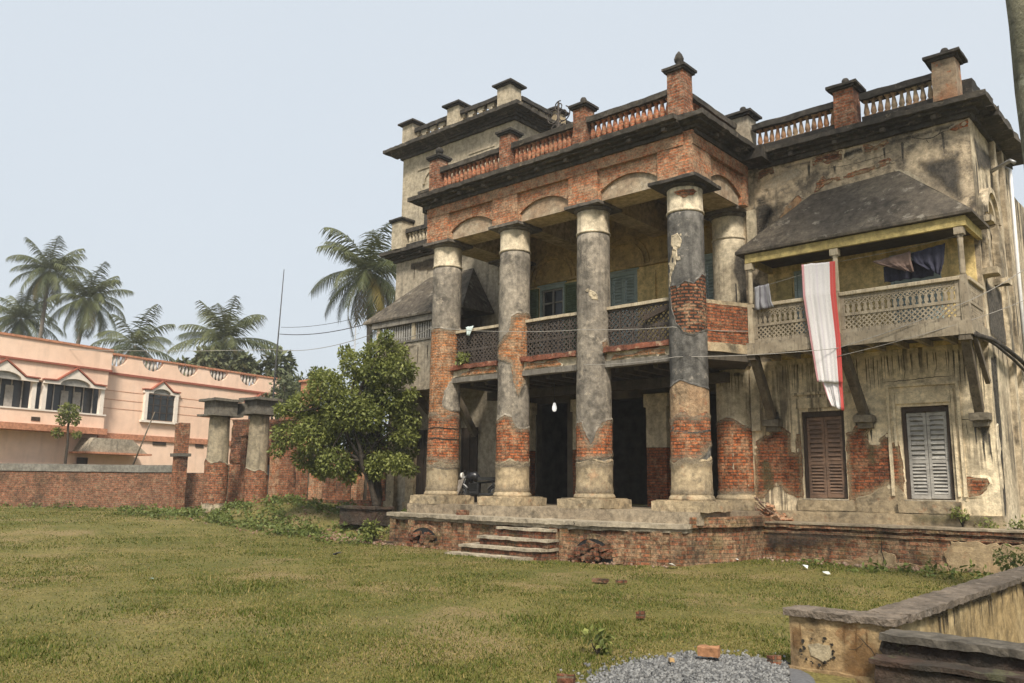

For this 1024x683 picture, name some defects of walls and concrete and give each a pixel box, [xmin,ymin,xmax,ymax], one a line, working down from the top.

flaking render [674,189,697,198]
water stain [756,161,815,235]
water stain [883,124,960,198]
flaking render [668,233,708,337]
flaking render [425,311,563,495]
water stain [856,281,1007,516]
flaking render [201,458,229,506]
flaking render [573,418,614,498]
flaking render [647,377,805,507]
flaking render [845,425,906,501]
flaking render [961,472,993,501]